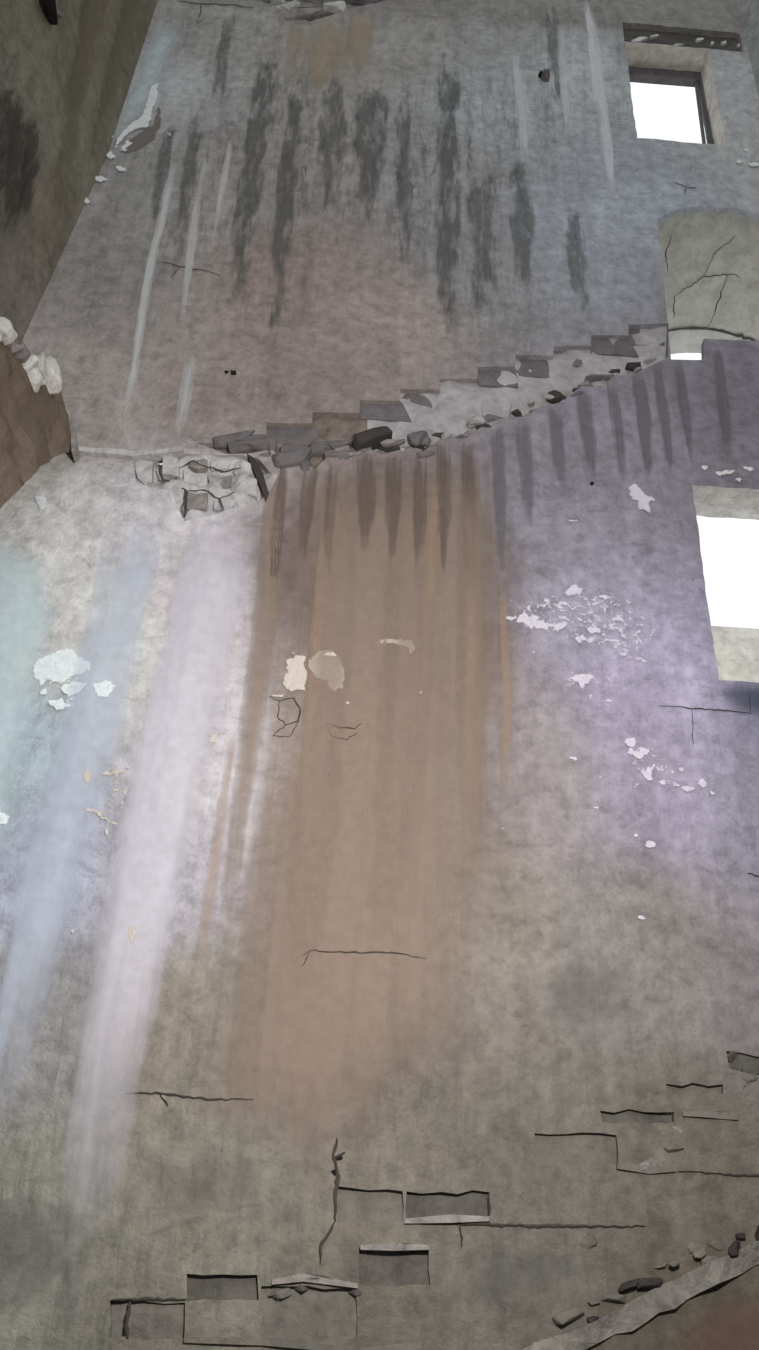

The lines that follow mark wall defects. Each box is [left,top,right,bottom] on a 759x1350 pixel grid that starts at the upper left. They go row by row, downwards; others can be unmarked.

leakage [585,8,613,183]
leakage [273,100,303,272]
leakage [437,73,460,313]
leakage [128,184,170,390]
crack [665,234,755,341]
leakage [634,368,690,467]
peeling [629,484,655,513]
peeling [33,648,116,710]
peeling [506,585,657,702]
leakage [99,557,233,1045]
crack [319,1138,345,1264]
spalling [522,1225,759,1350]